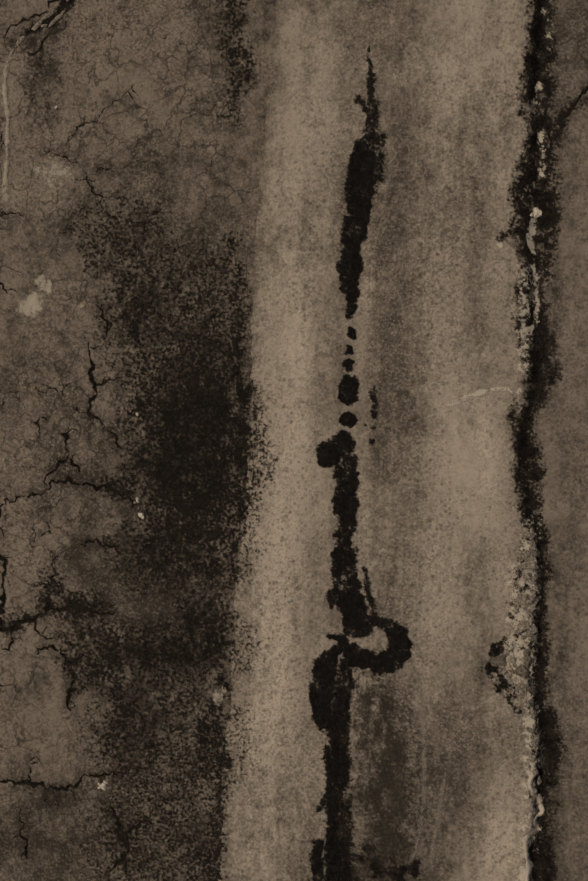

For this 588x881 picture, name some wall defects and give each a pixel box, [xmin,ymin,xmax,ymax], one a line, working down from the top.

crack [0,0,276,881]
leakage [2,191,278,881]
leakage [344,282,359,319]
leakage [321,665,435,881]
leakage [445,0,588,881]